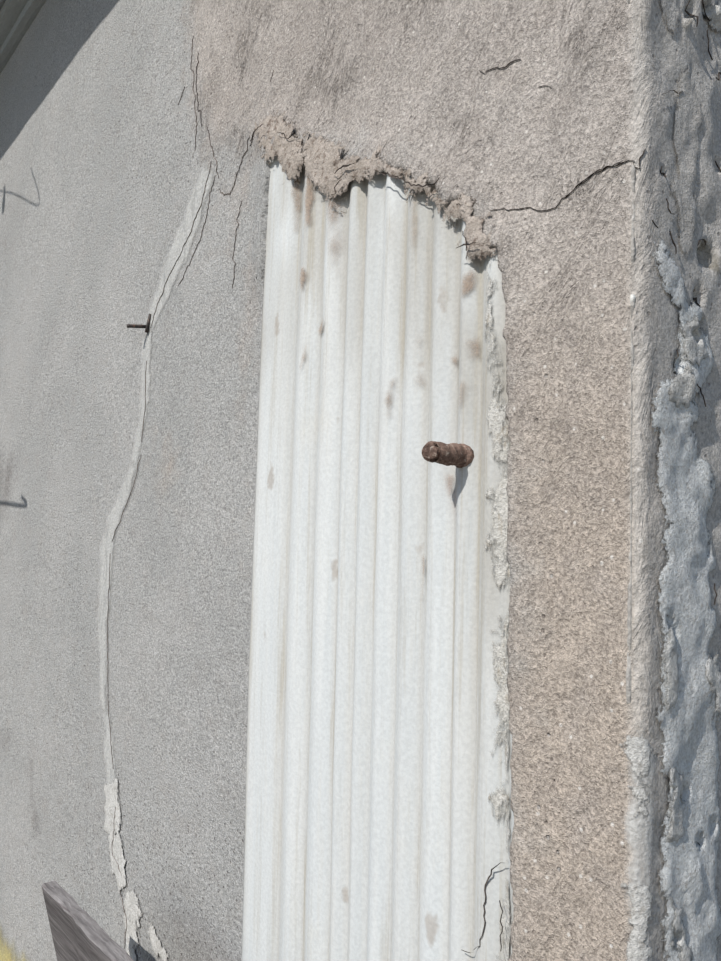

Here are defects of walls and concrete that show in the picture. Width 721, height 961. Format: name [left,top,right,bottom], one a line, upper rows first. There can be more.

flaking render [685,0,721,60]
crack [490,150,677,254]
flaking render [250,109,510,590]
crack [98,39,255,961]
peeling [619,230,721,961]
flaking render [488,611,510,850]
crack [462,862,503,953]